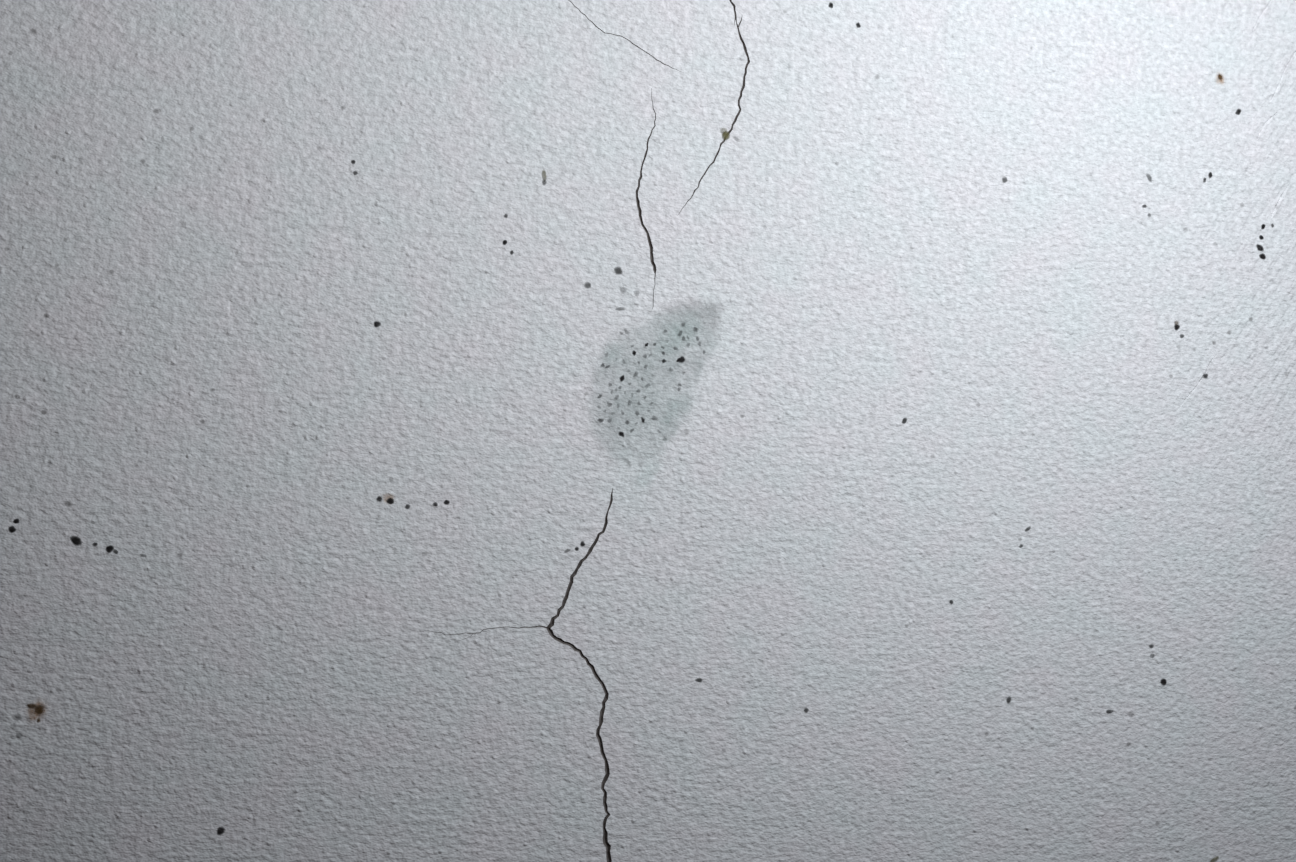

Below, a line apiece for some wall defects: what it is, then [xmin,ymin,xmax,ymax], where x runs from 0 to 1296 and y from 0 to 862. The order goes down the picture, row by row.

crack [569,0,684,309]
crack [680,0,750,212]
crack [419,488,613,862]